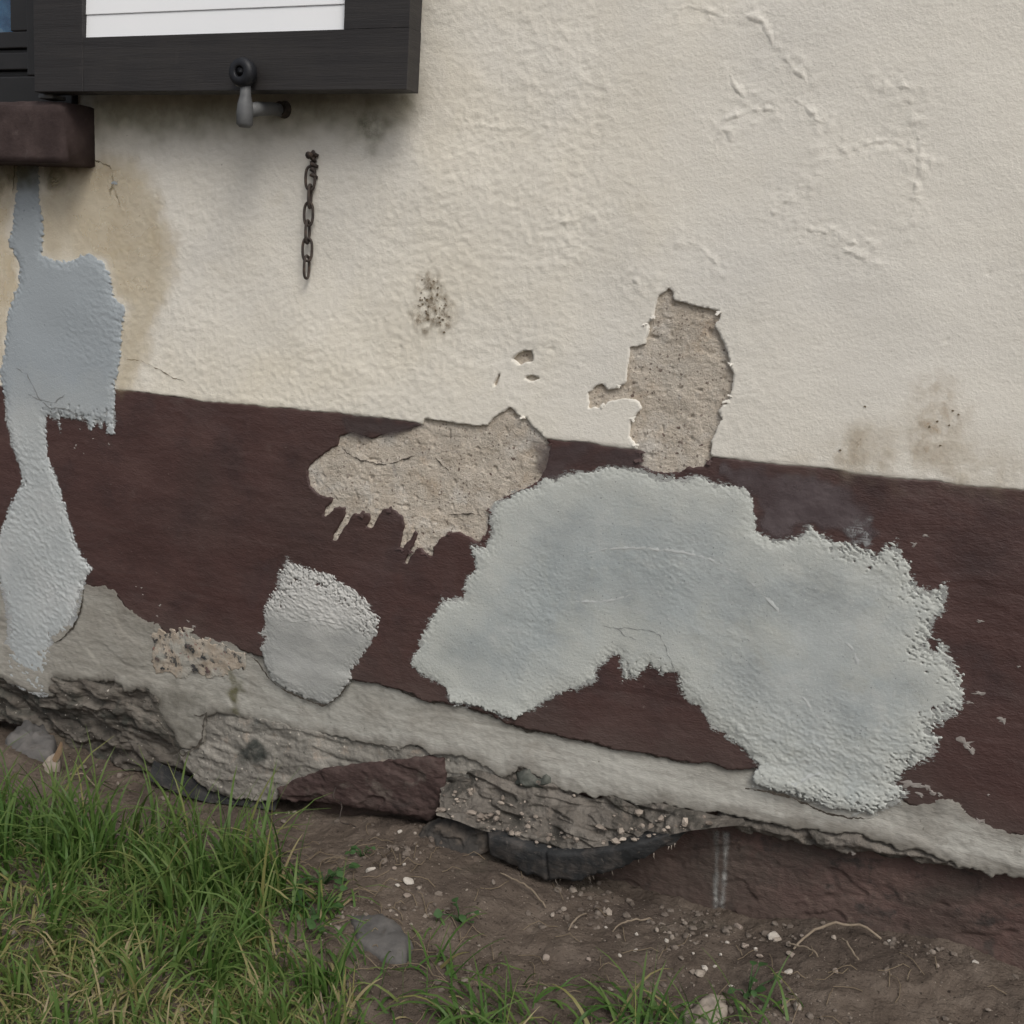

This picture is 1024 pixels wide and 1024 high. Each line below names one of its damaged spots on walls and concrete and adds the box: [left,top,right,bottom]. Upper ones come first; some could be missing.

leakage [416,274,450,333]
flaking render [514,351,533,365]
spalling [589,289,734,473]
spalling [308,407,553,564]
peeling [151,627,246,679]
spalling [0,675,969,869]